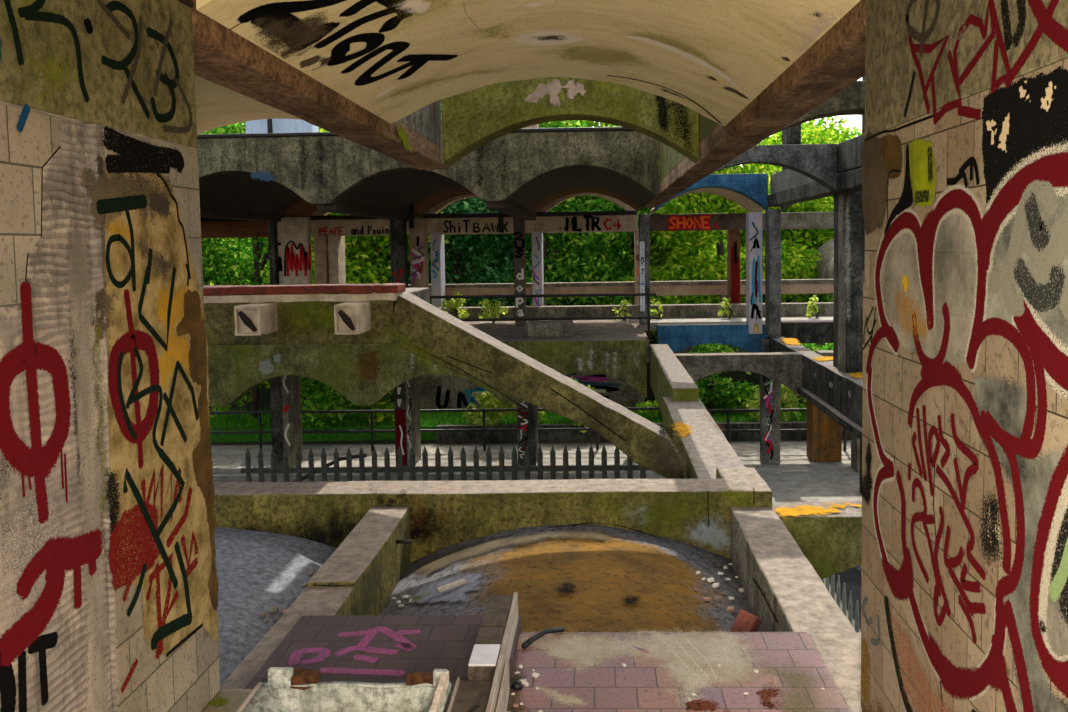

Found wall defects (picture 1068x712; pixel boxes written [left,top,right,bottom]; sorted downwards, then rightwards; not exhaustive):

peeling [525,79,587,107]
damp [656,95,696,155]
peeling [981,66,1068,206]
peeling [41,146,60,237]
flaking render [0,162,220,712]
damp [217,478,619,580]
damp [681,512,731,556]